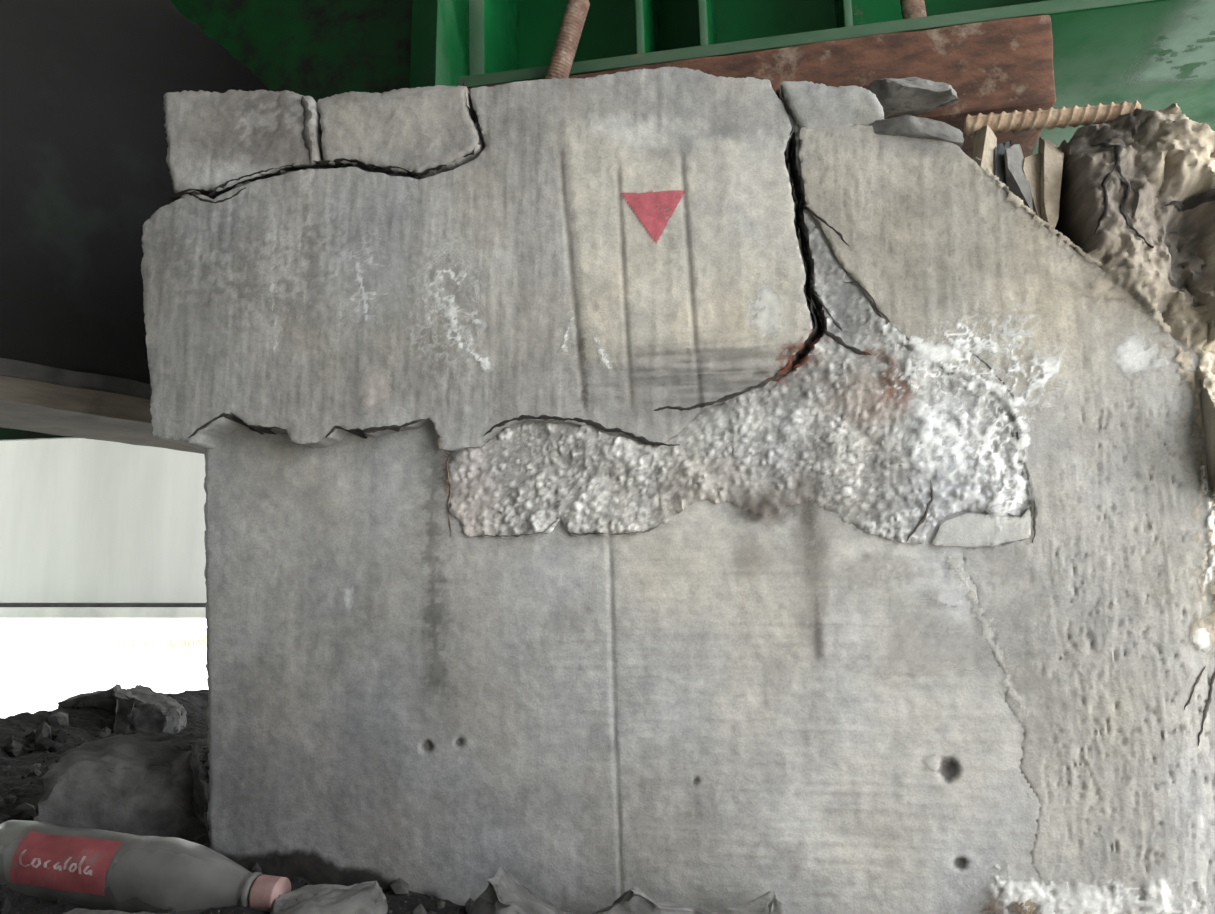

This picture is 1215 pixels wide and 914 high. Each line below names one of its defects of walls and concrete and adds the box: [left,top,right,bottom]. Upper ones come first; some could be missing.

crack [168,82,481,203]
spalling [868,77,1141,231]
water stain [423,250,493,371]
crack [484,85,910,446]
crack [188,413,281,438]
crack [325,419,426,439]
spalling [446,211,1031,716]
crack [906,479,934,542]
crack [968,348,1038,543]
crack [1184,666,1215,746]
rust [984,899,1056,914]